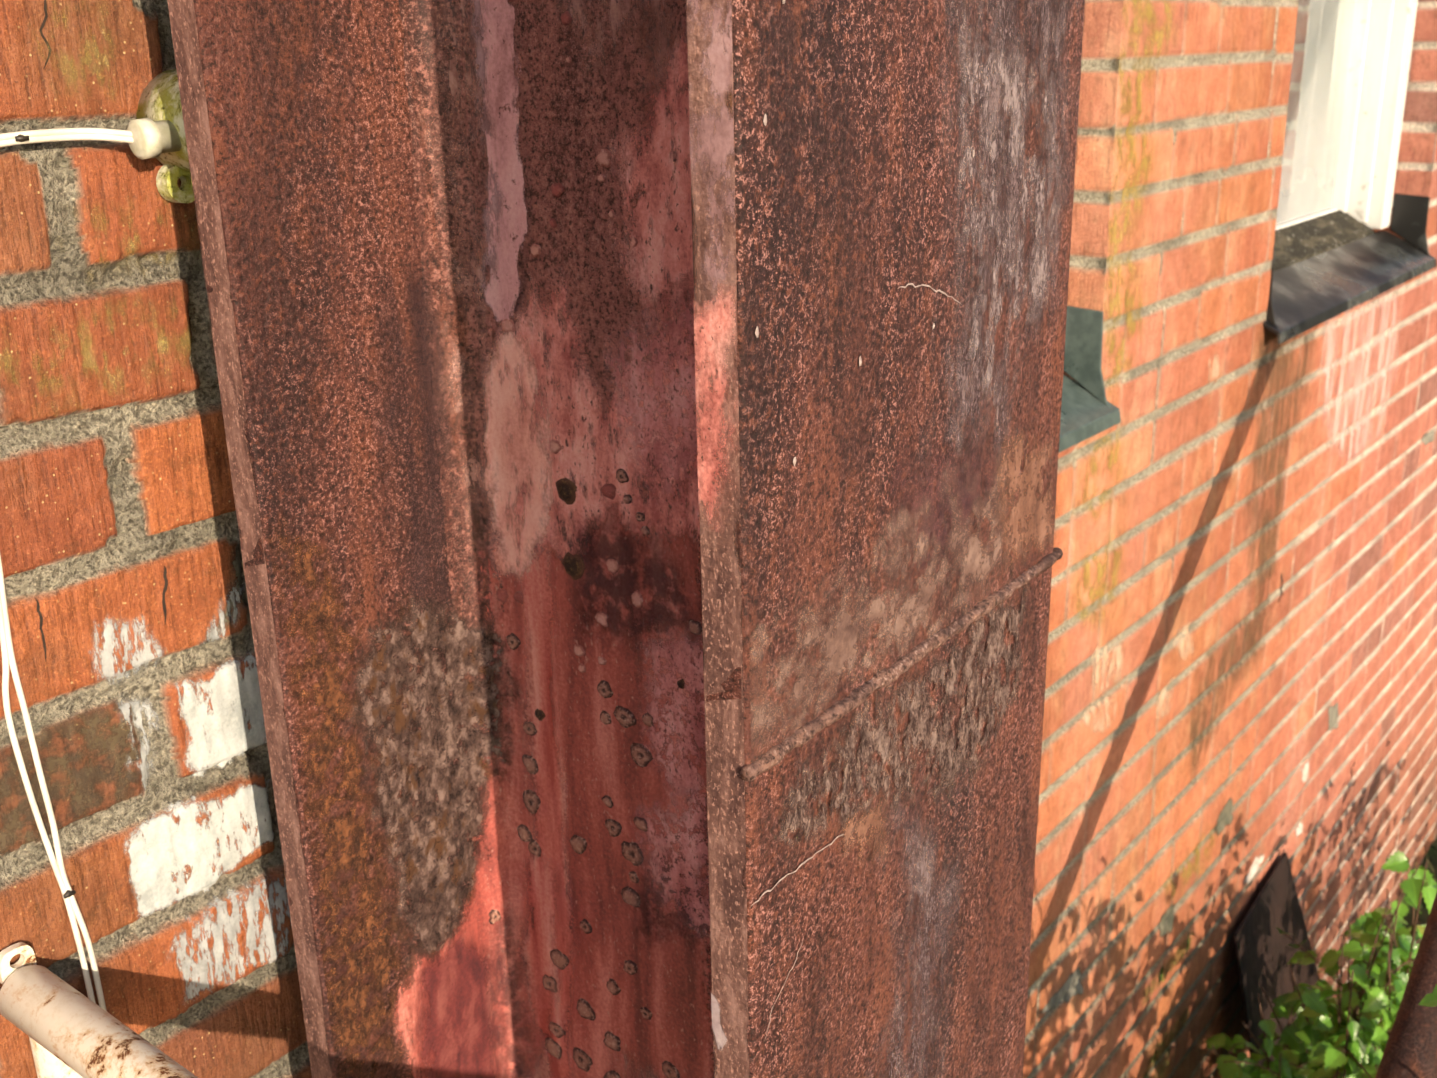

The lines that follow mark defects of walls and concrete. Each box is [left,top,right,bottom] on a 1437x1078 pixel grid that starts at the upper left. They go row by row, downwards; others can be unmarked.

spalling [203,544,246,644]
corrosion [167,0,546,1078]
peeling [394,0,735,1078]
corrosion [555,478,577,505]
corrosion [686,0,1055,1078]
peeling [94,619,163,683]
peeling [118,700,157,788]
peeling [177,655,267,776]
corrosion [597,680,654,768]
peeling [125,779,291,999]
corrosion [601,795,648,907]
corrosion [545,1021,621,1078]